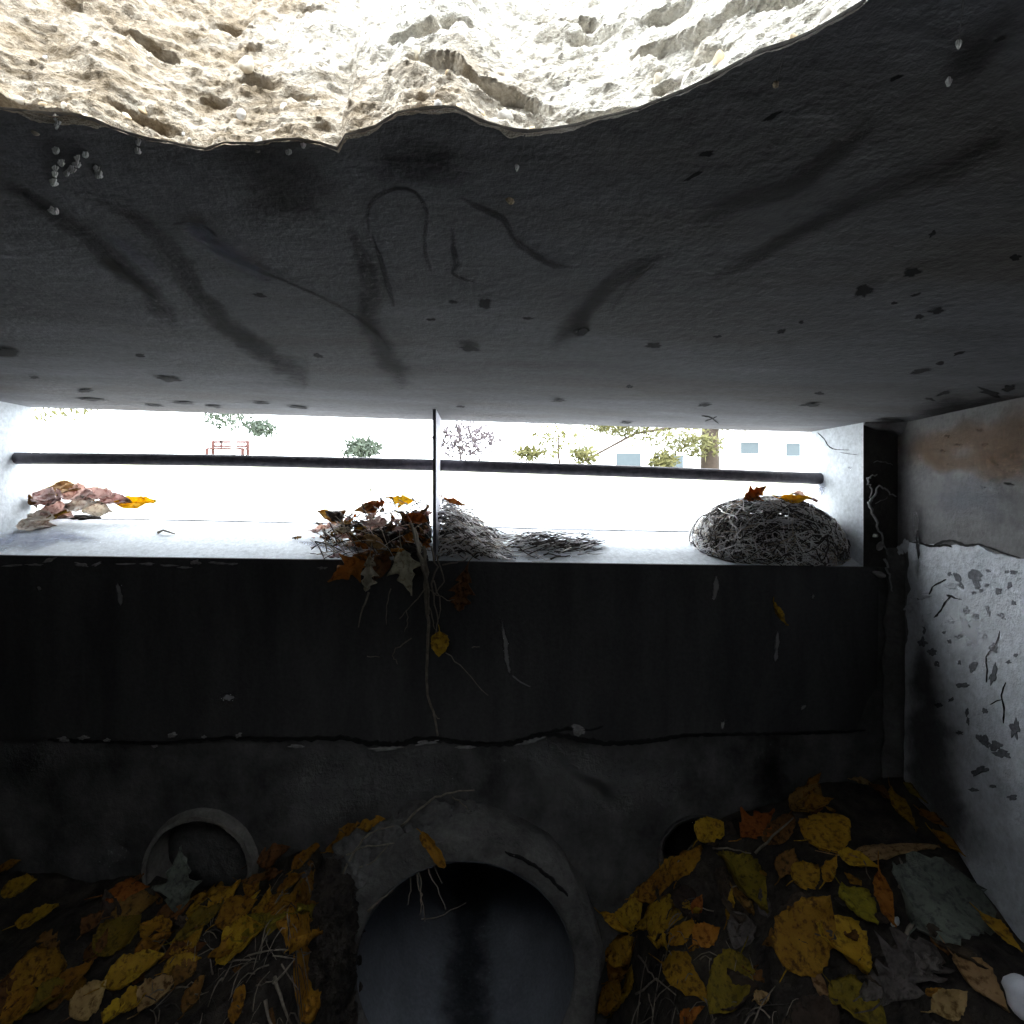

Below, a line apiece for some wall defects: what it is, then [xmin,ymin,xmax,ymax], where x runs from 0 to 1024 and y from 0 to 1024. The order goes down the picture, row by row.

spalling [0,0,863,153]
water stain [49,146,103,187]
water stain [23,193,166,314]
water stain [173,158,459,372]
crack [917,579,962,618]
crack [985,631,1006,723]
crack [47,724,866,752]
crack [505,851,569,897]